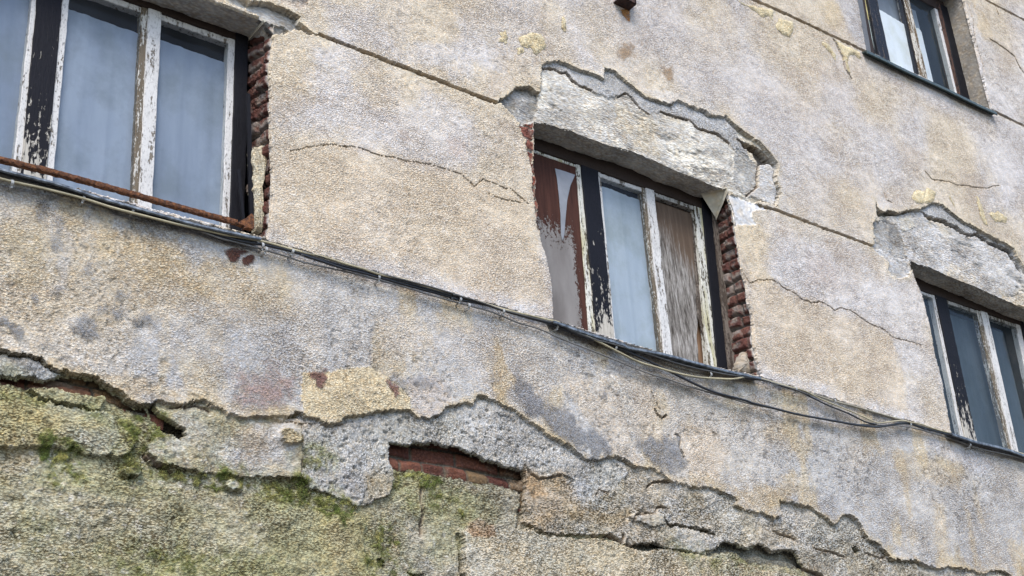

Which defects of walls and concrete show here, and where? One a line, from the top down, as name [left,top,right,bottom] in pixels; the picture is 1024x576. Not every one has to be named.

corrosion [0,156,254,232]
corrosion [225,248,254,265]
flaking render [227,0,318,238]
crack [290,143,530,205]
flaking render [497,30,782,376]
crack [743,273,923,346]
flaking render [872,188,1024,306]
flaking render [0,352,1011,576]